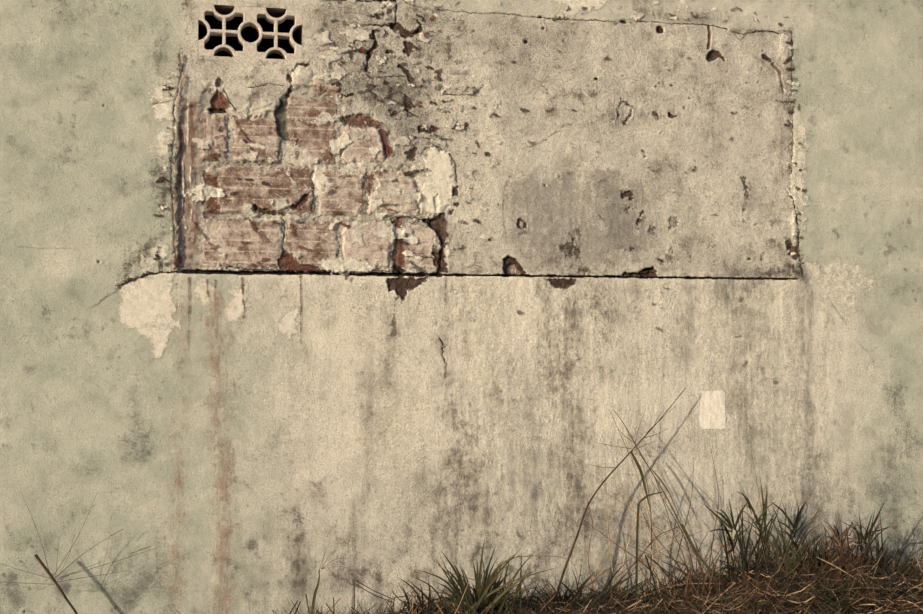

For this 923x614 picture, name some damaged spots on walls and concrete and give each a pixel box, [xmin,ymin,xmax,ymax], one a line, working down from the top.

crack [327,0,614,27]
peeling [551,0,610,21]
flaking render [657,0,728,72]
crack [636,21,793,173]
flaking render [148,0,487,310]
crack [89,68,803,309]
flaking render [560,229,582,258]
peeling [116,227,181,359]
peeling [224,281,251,324]
flaking render [503,256,526,276]
flaking render [544,268,587,289]
flaking render [622,248,673,290]